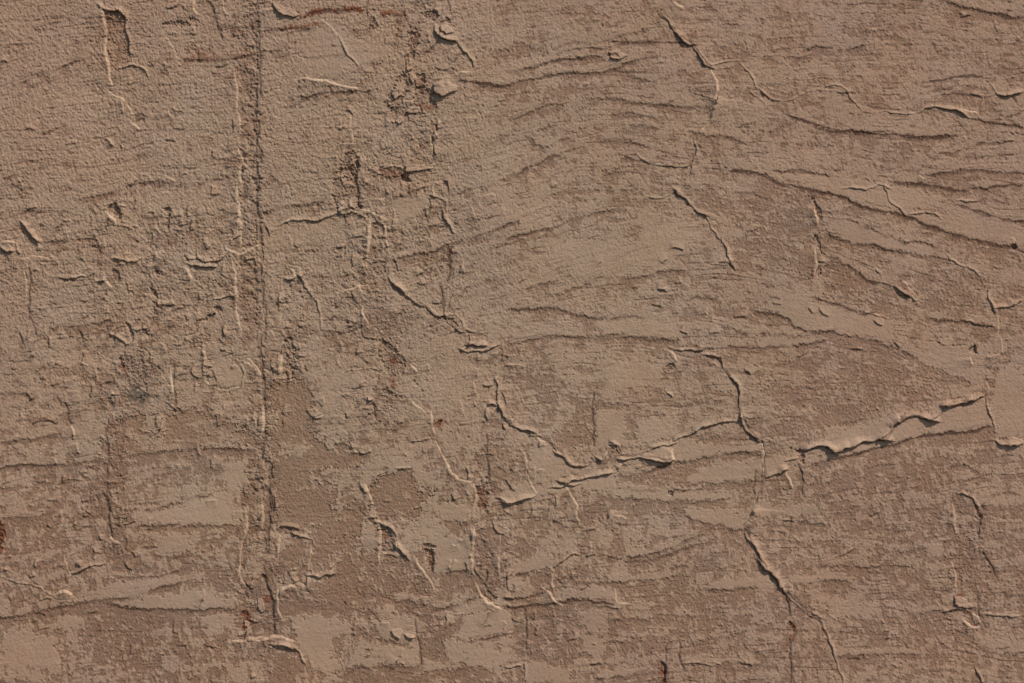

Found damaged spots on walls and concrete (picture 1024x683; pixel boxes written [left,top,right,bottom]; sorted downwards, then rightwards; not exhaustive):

crack [366,1,378,30]
peeling [101,269,437,622]
crack [184,18,1024,683]
spalling [232,627,311,673]